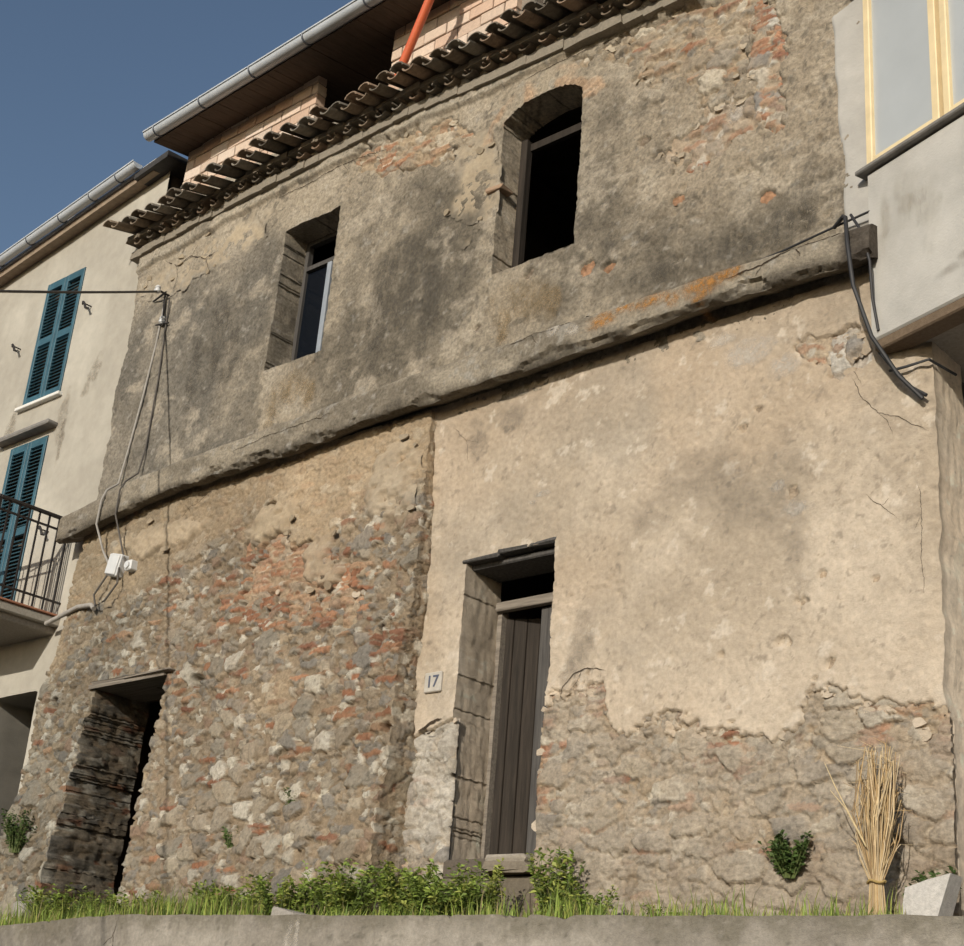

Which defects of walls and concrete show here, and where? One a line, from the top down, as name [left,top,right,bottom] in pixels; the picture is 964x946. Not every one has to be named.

flaking render [604,0,789,173]
flaking render [356,118,502,250]
flaking render [795,327,873,381]
crack [853,371,929,431]
flaking render [243,515,367,628]
flaking render [402,717,460,891]
flaking render [531,674,959,917]